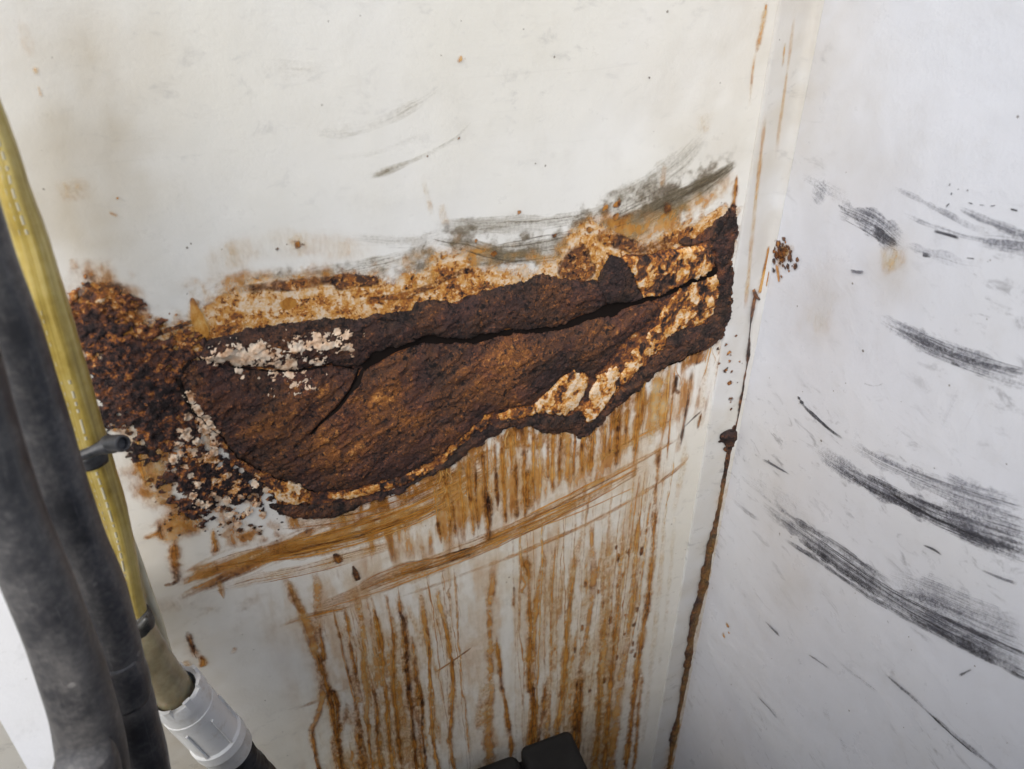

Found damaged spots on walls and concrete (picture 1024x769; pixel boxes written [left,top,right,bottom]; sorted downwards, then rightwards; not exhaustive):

corrosion [67,178,740,769]
crack [175,266,718,492]